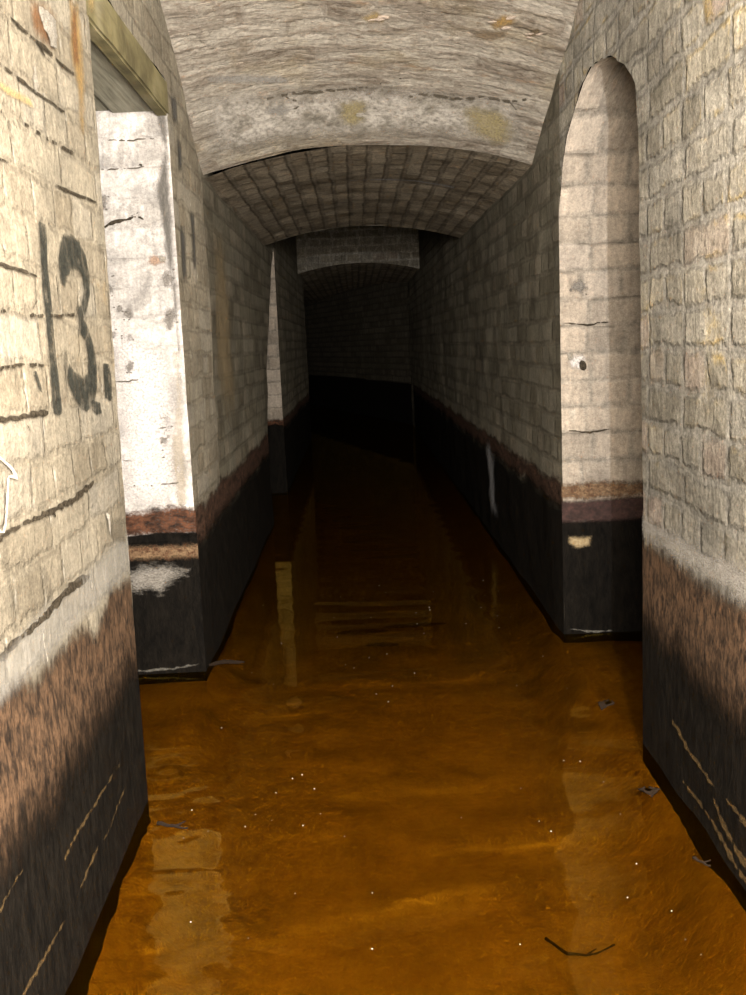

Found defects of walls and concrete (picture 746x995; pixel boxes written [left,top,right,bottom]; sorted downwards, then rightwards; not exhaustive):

leakage [109,285,134,342]
leakage [569,280,587,295]
leakage [0,375,746,995]